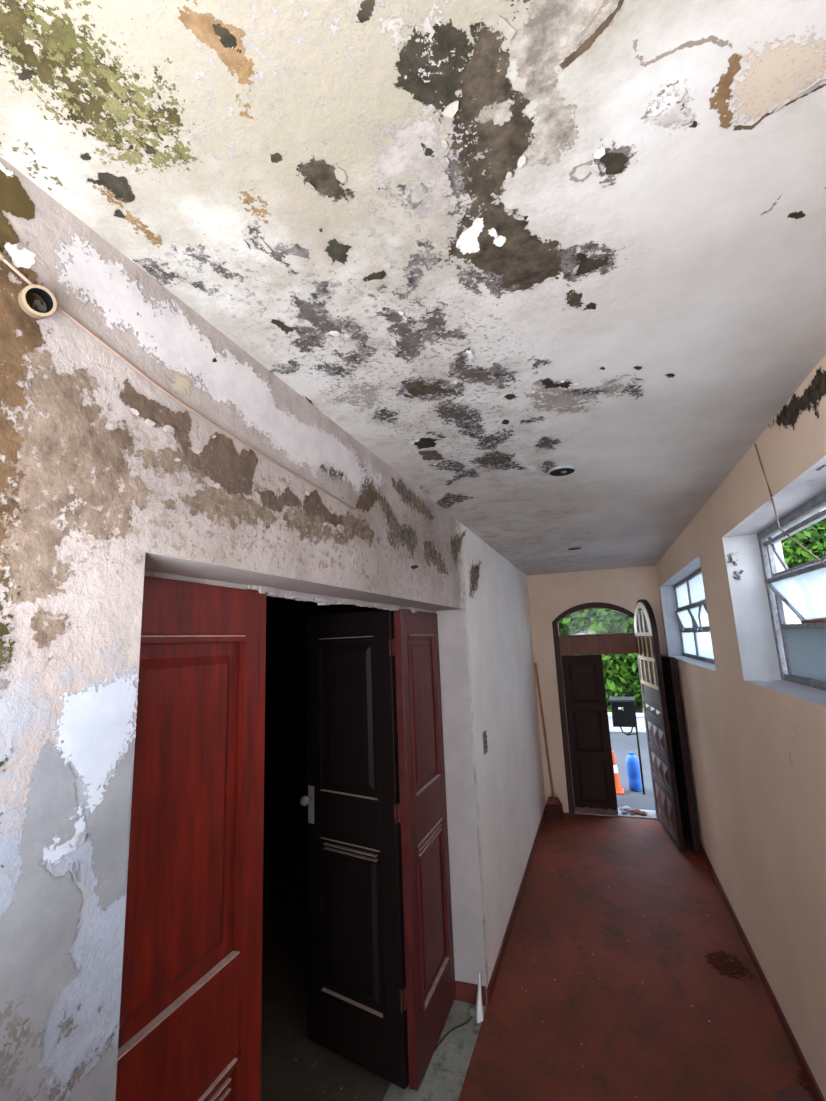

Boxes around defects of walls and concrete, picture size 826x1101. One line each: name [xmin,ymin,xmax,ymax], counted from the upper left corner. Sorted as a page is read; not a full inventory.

water stain [0,242,98,698]
water stain [0,0,535,481]
peeling [54,0,645,613]
peeling [632,26,826,131]
flaking render [768,366,826,430]
peeling [0,668,139,1101]